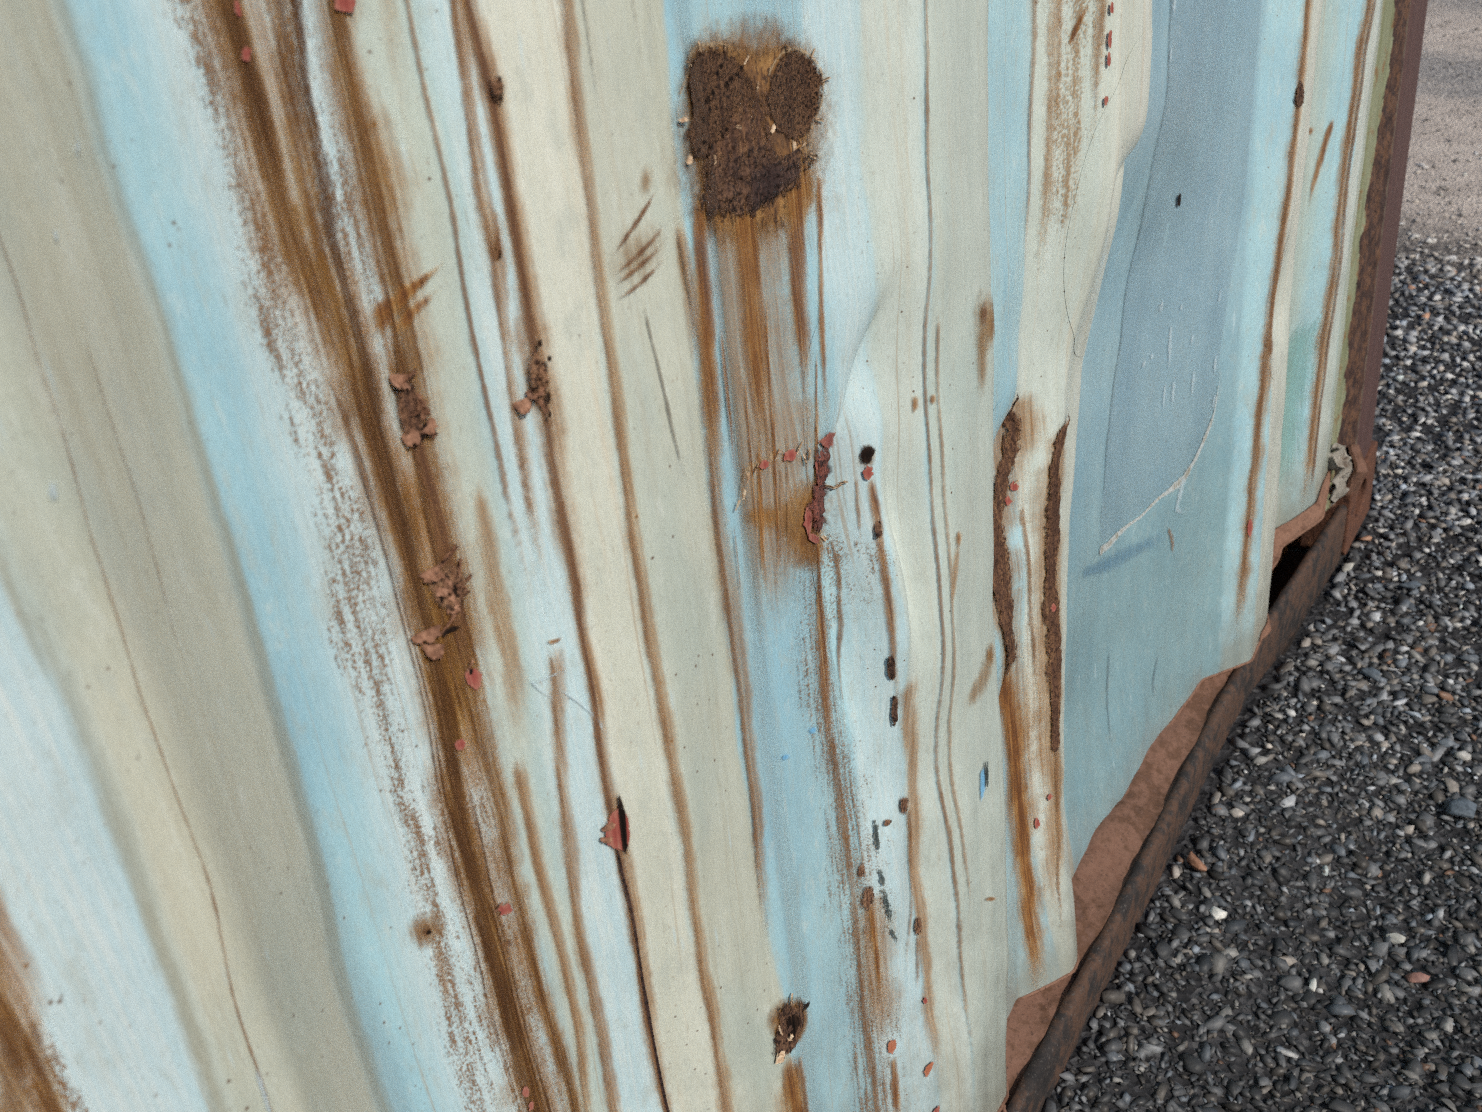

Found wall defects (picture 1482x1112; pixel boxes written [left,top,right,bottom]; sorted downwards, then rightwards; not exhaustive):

peeling [334,0,356,12]
rust [165,0,618,1112]
peeling [389,368,439,448]
peeling [411,544,472,660]
peeling [600,795,630,853]
rust [615,401,731,1112]
peeling [735,432,848,567]
rust [791,534,935,1112]
rust [913,64,968,1001]
rust [973,394,1070,955]
rust [1240,0,1310,594]
rust [1308,0,1376,482]